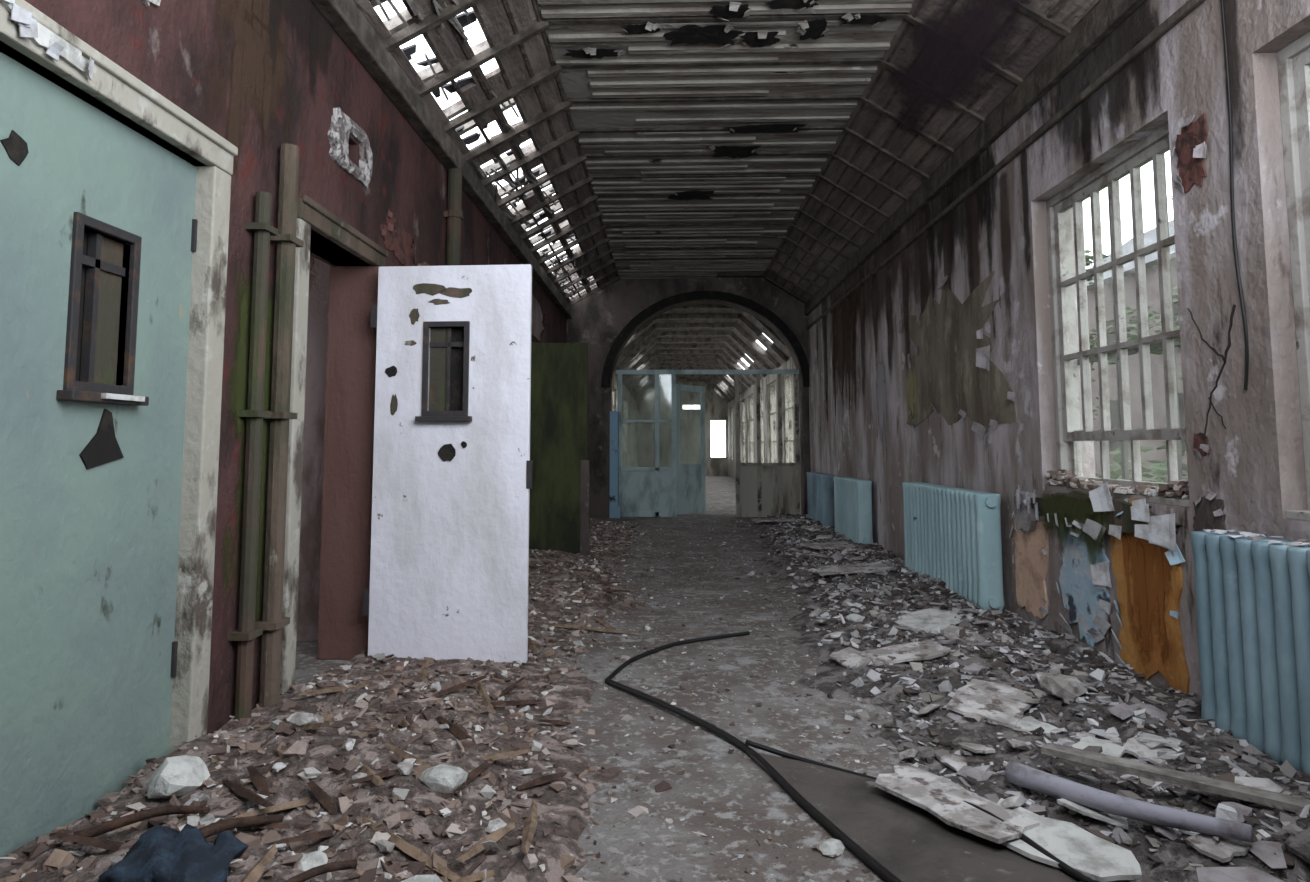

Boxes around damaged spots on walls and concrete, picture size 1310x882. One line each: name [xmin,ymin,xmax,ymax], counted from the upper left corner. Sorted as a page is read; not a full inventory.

damp [1039,0,1158,164]
peeling [1170,113,1208,193]
damp [1223,0,1242,158]
damp [816,148,1043,449]
peeling [1009,482,1226,694]